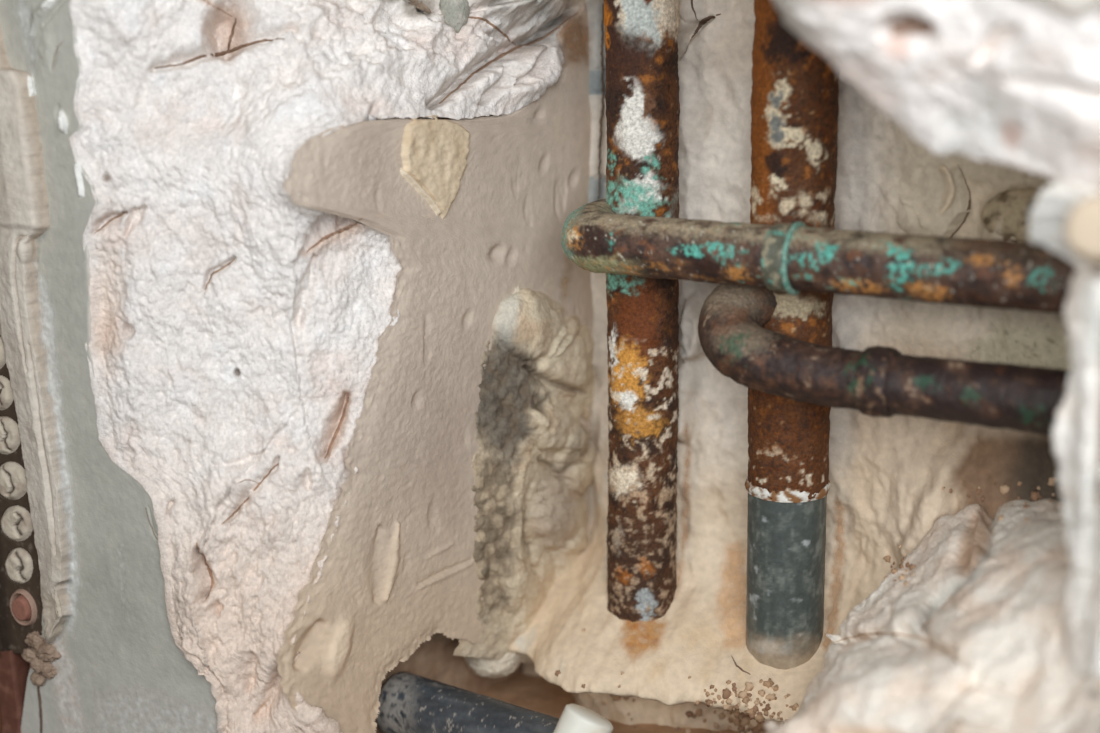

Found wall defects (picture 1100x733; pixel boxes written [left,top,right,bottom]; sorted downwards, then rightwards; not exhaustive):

crack [154,0,284,69]
flaking render [69,0,596,733]
crack [324,397,349,458]
flaking render [764,0,1100,733]